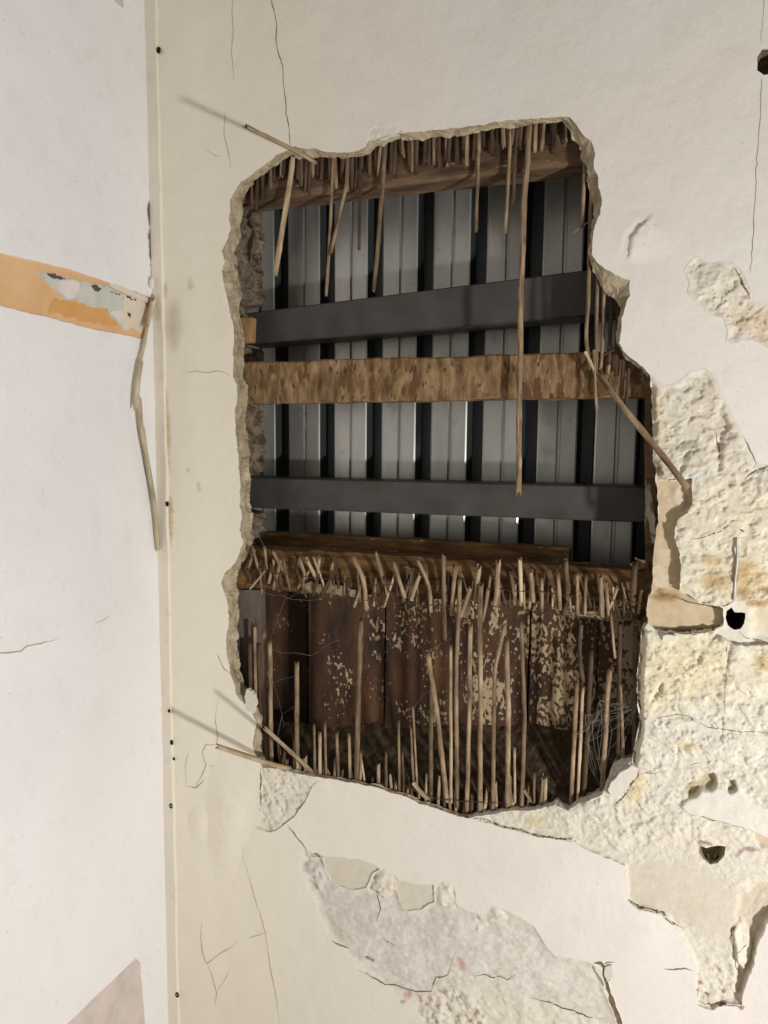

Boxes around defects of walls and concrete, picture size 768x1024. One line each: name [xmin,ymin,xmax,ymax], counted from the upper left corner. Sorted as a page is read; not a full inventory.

crack [271,0,290,141]
peeling [0,254,150,339]
flaking render [221,117,768,1024]
crack [185,700,219,789]
crack [200,849,280,1022]